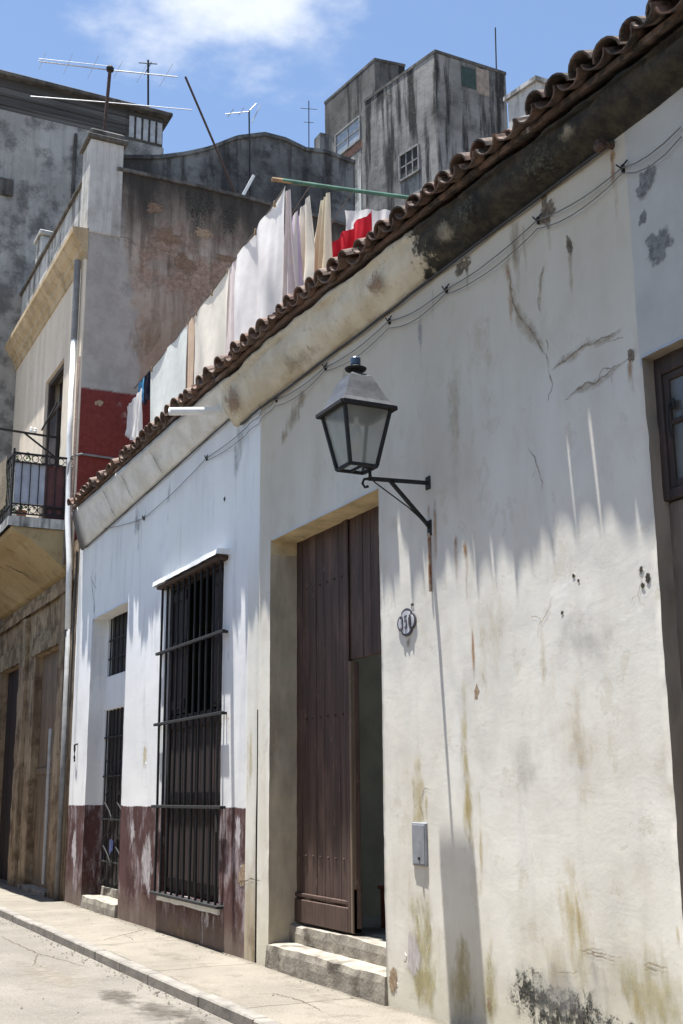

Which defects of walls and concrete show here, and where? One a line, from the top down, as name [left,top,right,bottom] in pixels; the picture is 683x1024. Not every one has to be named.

peeling [636,166,656,226]
peeling [642,230,673,264]
crack [509,276,616,399]
water stain [511,969,632,1024]